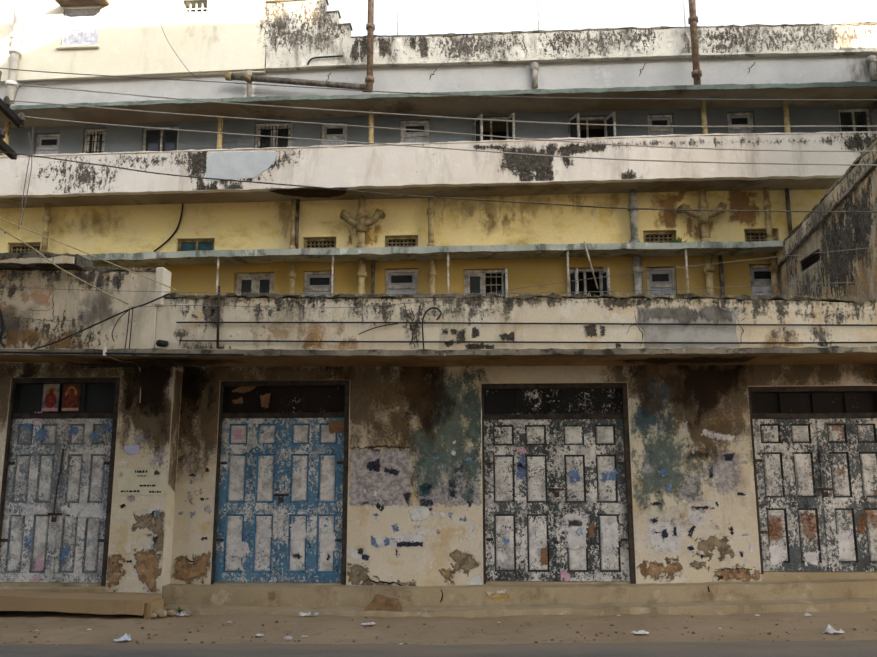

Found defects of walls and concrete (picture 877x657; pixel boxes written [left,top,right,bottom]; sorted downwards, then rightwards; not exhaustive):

damp [0,0,877,97]
damp [33,151,260,193]
damp [170,133,877,349]
damp [0,360,485,500]
damp [603,356,877,465]
spalling [106,512,211,592]
spalling [439,549,480,586]
spalling [637,526,761,582]